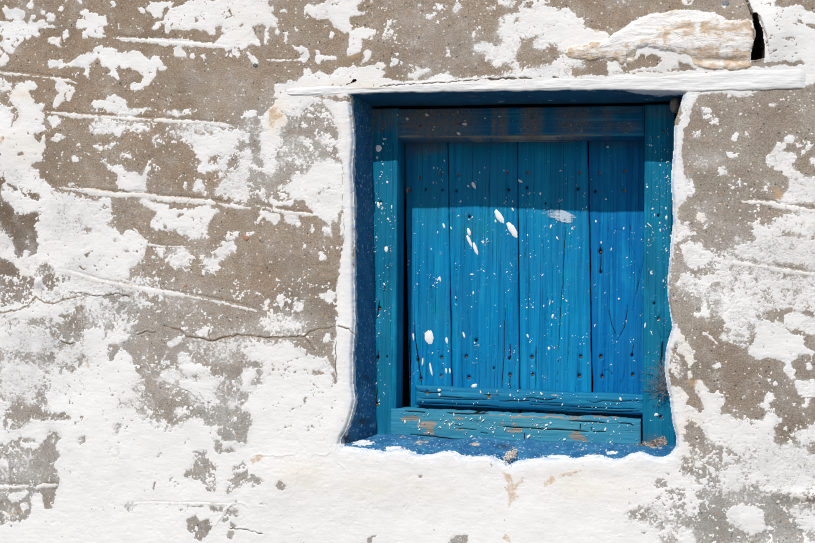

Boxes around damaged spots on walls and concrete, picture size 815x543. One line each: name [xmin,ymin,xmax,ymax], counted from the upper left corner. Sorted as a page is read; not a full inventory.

peeling [761,0,815,30]
peeling [0,308,22,339]
crack [0,292,130,313]
peeling [623,82,815,543]
crack [137,325,354,377]
peeling [108,418,133,459]
peeling [0,430,62,528]
peeling [448,534,469,543]